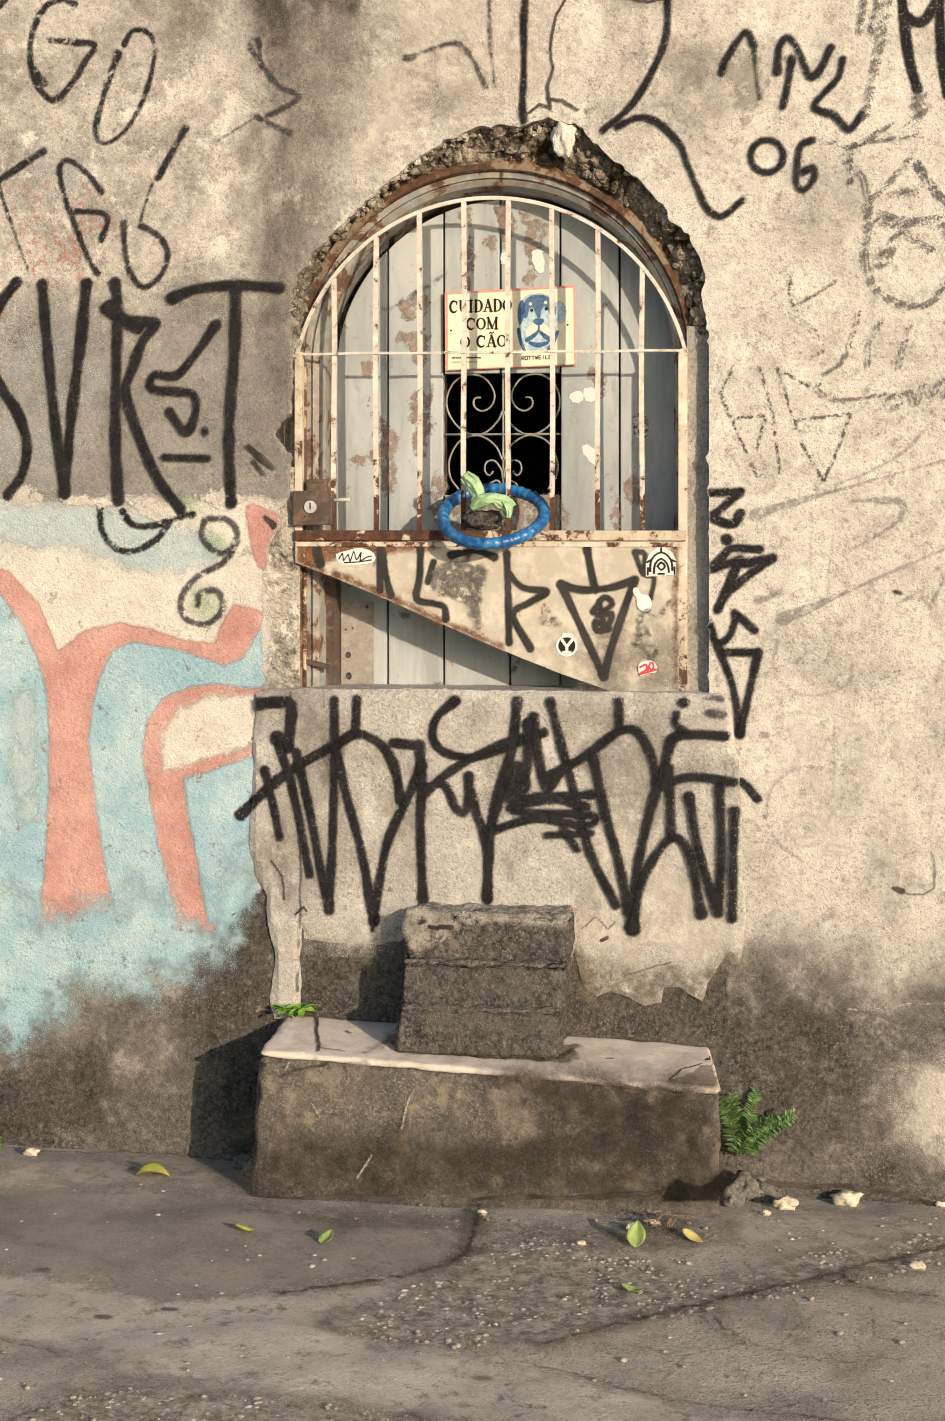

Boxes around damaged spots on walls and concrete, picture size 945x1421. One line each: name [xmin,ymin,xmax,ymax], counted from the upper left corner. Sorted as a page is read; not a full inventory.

crack [528,0,579,114]
flaking render [289,119,709,366]
peeling [9,484,43,505]
peeling [60,494,177,521]
peeling [194,487,247,509]
flaking render [256,421,300,689]
corrosion [297,540,503,649]
damp [0,894,278,1194]
peeling [566,952,729,1086]
damp [714,966,945,1267]
crack [281,1203,481,1294]
crack [522,1244,945,1421]